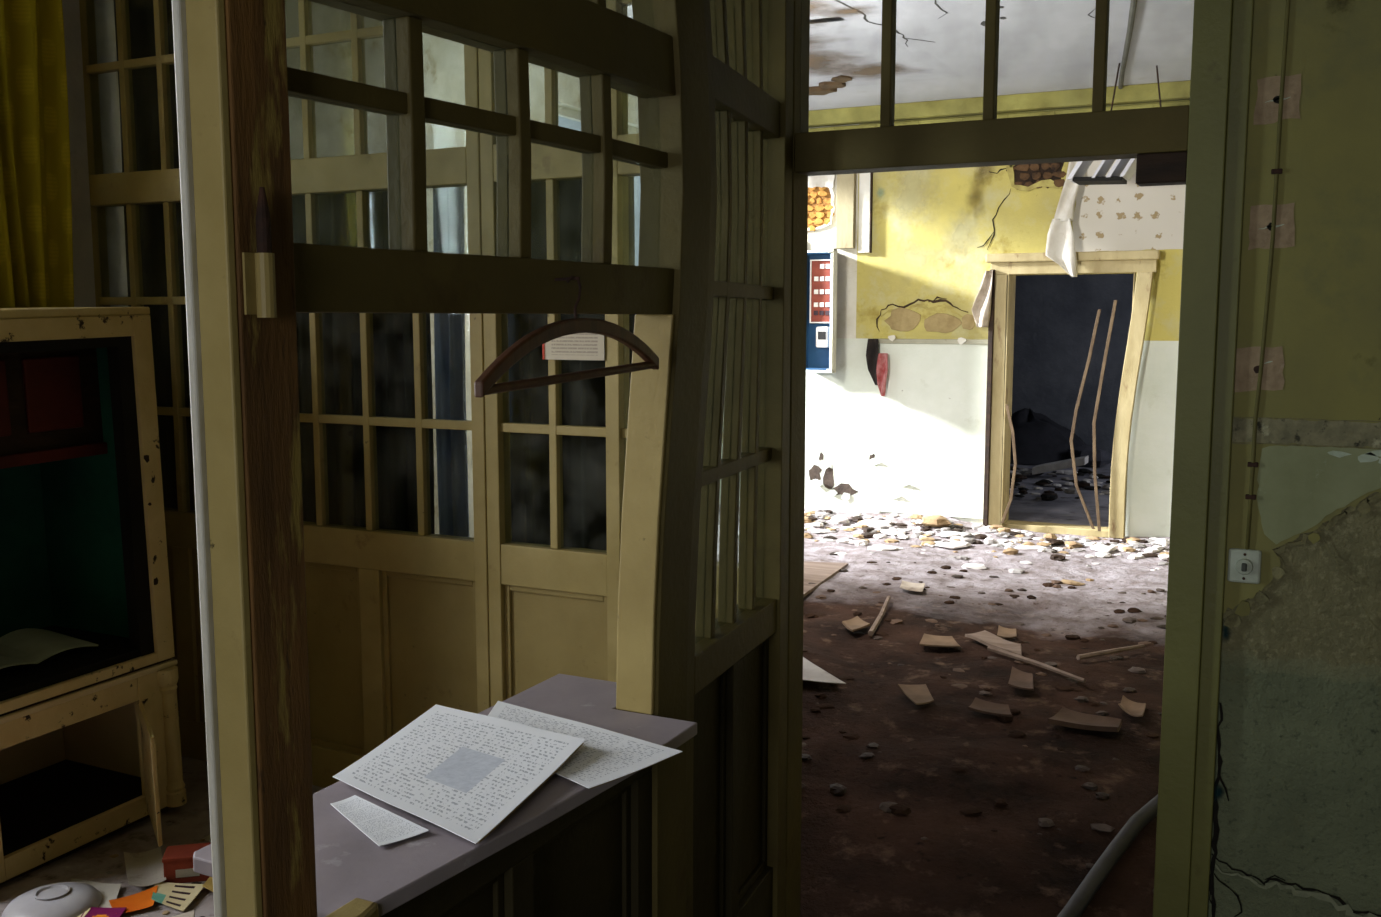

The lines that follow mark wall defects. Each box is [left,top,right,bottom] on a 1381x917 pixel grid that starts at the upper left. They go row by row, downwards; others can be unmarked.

damp [810,1,860,15]
damp [809,41,902,76]
crack [977,168,1011,250]
spalling [1006,162,1069,191]
spalling [1208,416,1381,917]
crack [1209,703,1381,917]